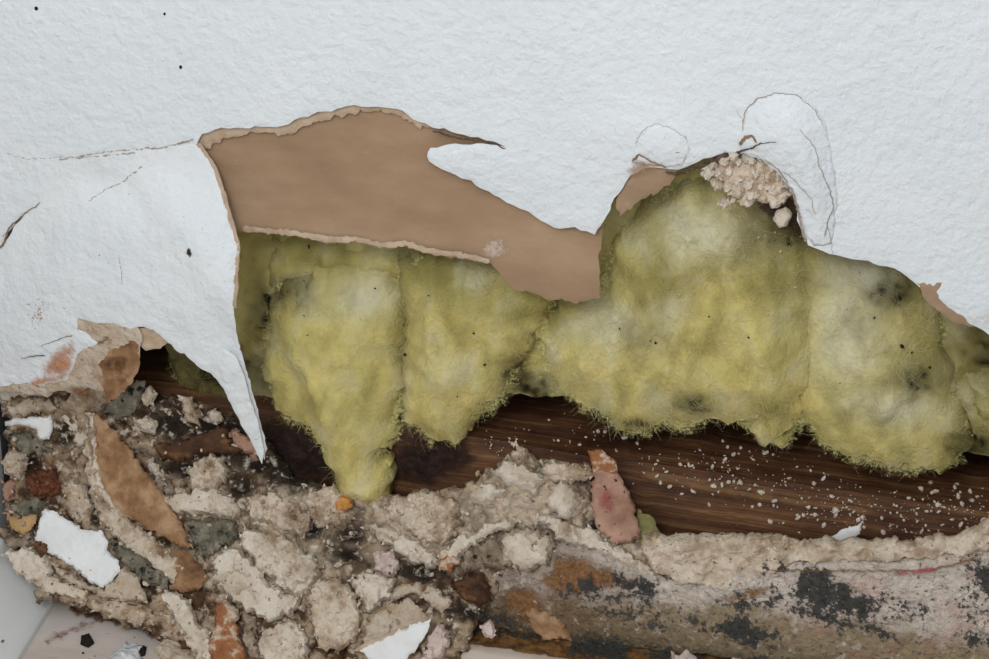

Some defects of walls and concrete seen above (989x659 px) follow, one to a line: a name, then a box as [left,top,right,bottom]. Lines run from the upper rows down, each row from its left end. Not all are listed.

crack [0,202,40,248]
crack [7,139,193,201]
spalling [700,151,802,233]
peeling [0,143,267,463]
peeling [35,509,120,588]
spalling [641,517,989,590]
water stain [468,557,932,659]
water stain [945,553,989,654]